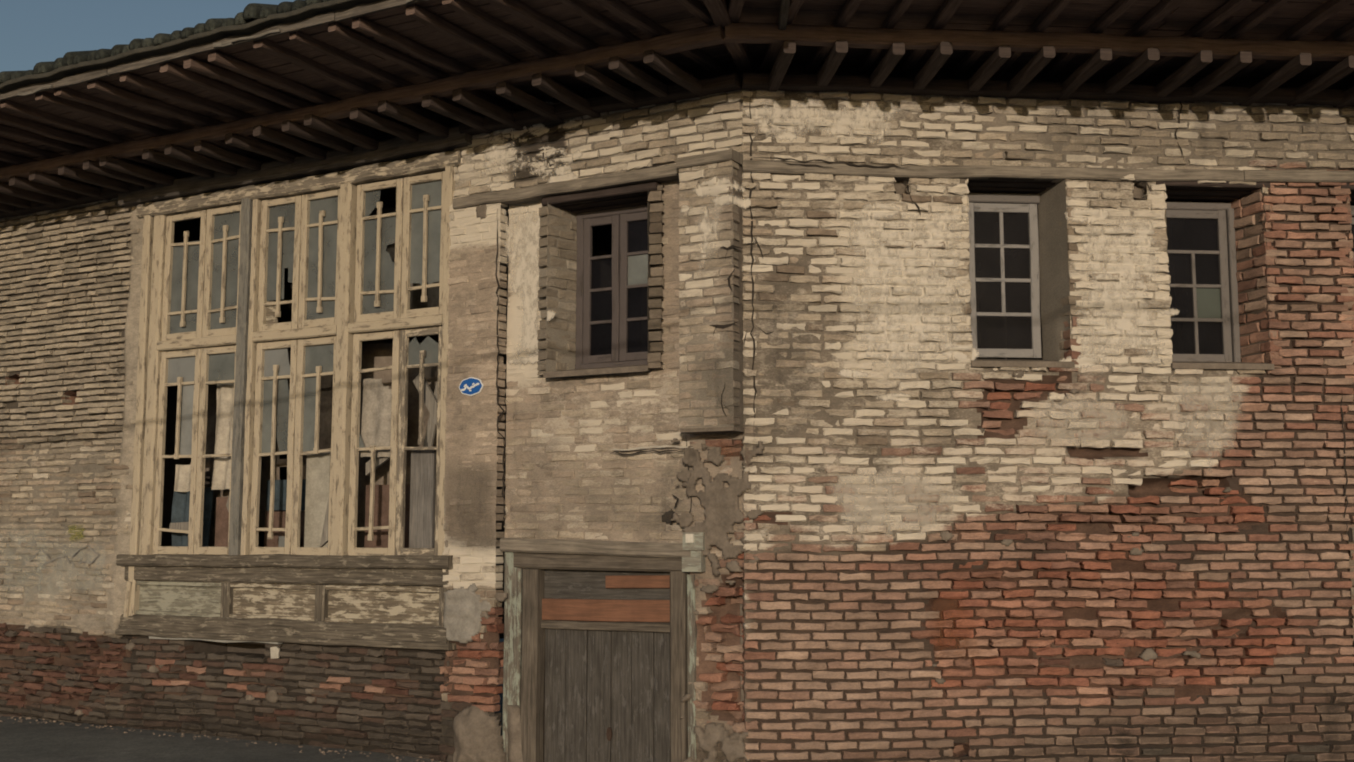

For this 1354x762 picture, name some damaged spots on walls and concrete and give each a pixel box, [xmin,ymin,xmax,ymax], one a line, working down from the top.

spalling [662,438,792,762]